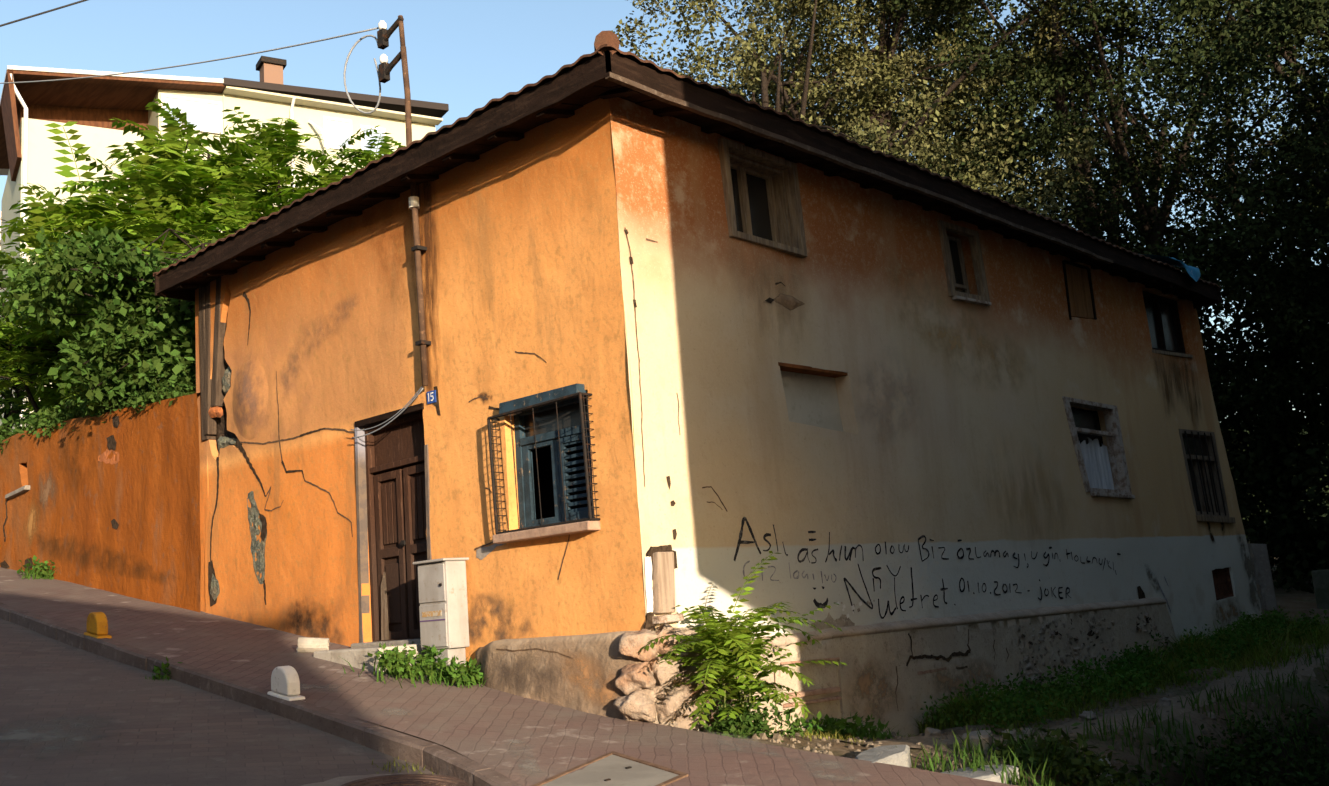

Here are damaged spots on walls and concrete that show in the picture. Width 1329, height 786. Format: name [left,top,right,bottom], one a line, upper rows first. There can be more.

crack [208,371,355,607]
spalling [247,491,267,605]
crack [895,629,1009,708]